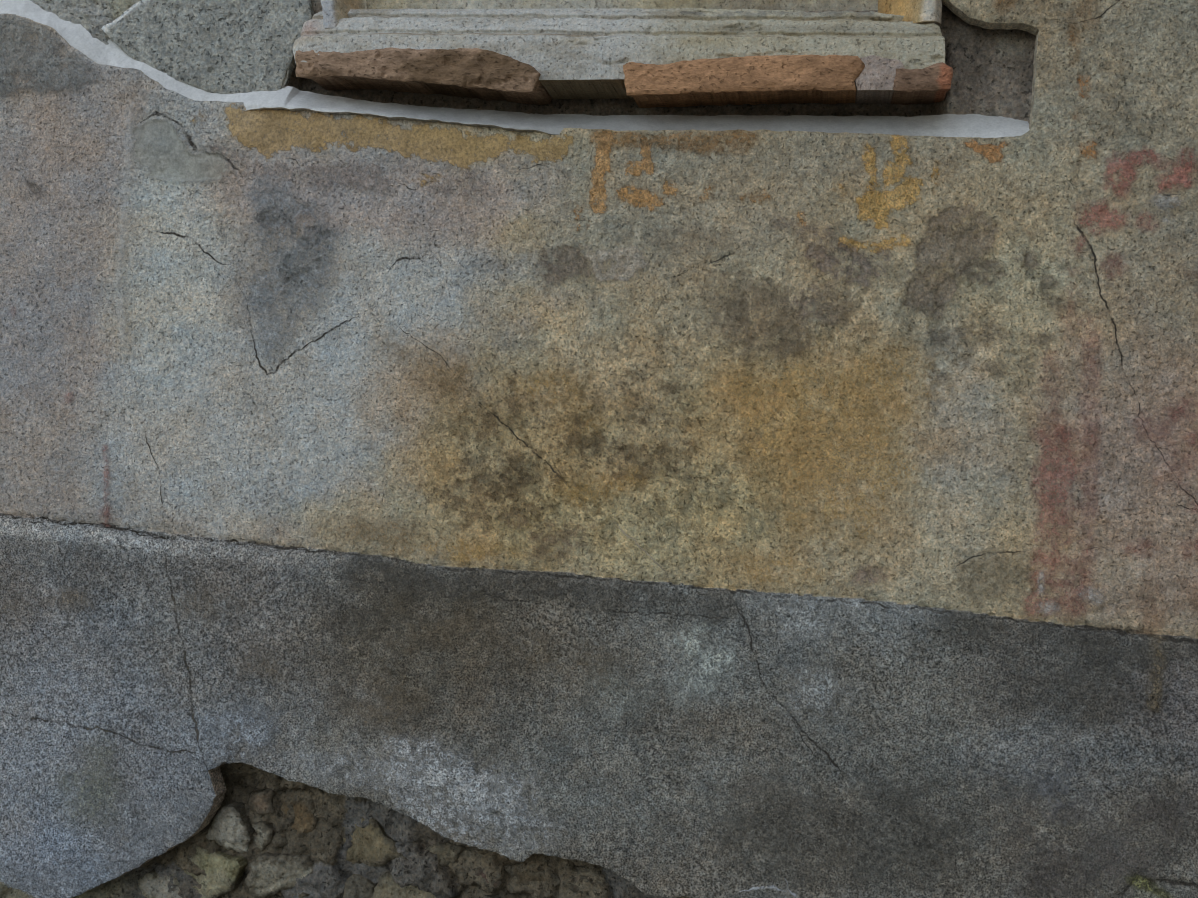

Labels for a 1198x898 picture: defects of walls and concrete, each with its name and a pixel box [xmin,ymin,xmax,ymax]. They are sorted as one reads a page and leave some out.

crack [157,231,226,265]
crack [246,299,359,375]
crack [1074,222,1198,510]
crack [0,513,412,770]
crack [445,524,1198,685]
crack [784,706,840,770]
flaking render [0,881,35,898]
flaking render [71,762,690,898]